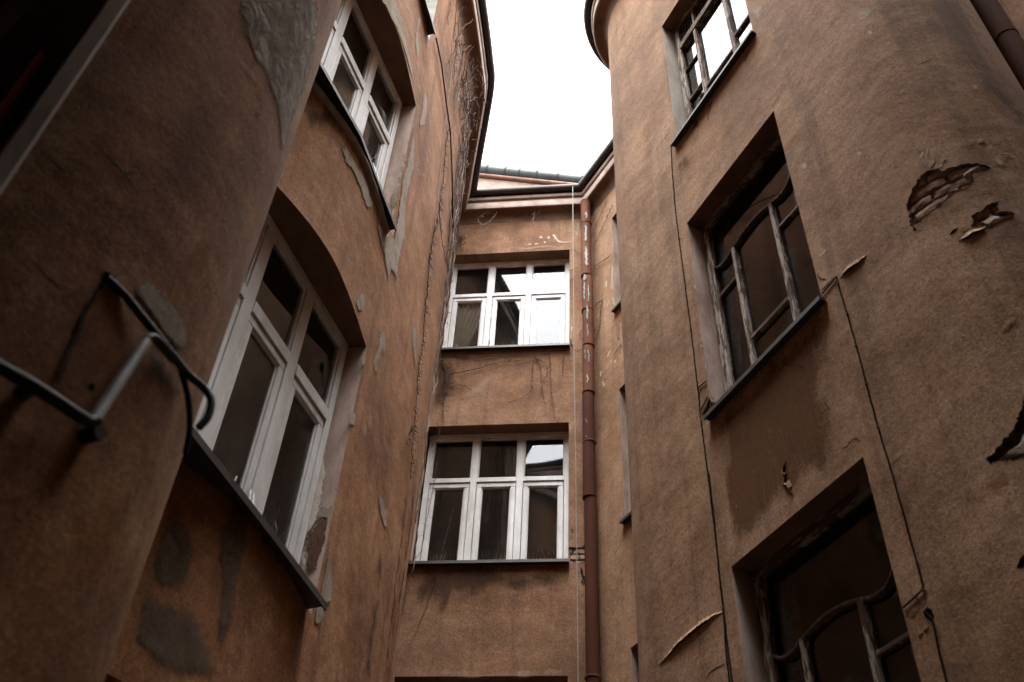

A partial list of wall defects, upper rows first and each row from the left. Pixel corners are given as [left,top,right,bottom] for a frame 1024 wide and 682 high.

flaking render [240,0,318,148]
spalling [906,155,1010,231]
spalling [950,202,1014,240]
damp [723,322,830,537]
spalling [986,400,1024,464]
peeling [302,459,327,570]
peeling [659,611,722,664]